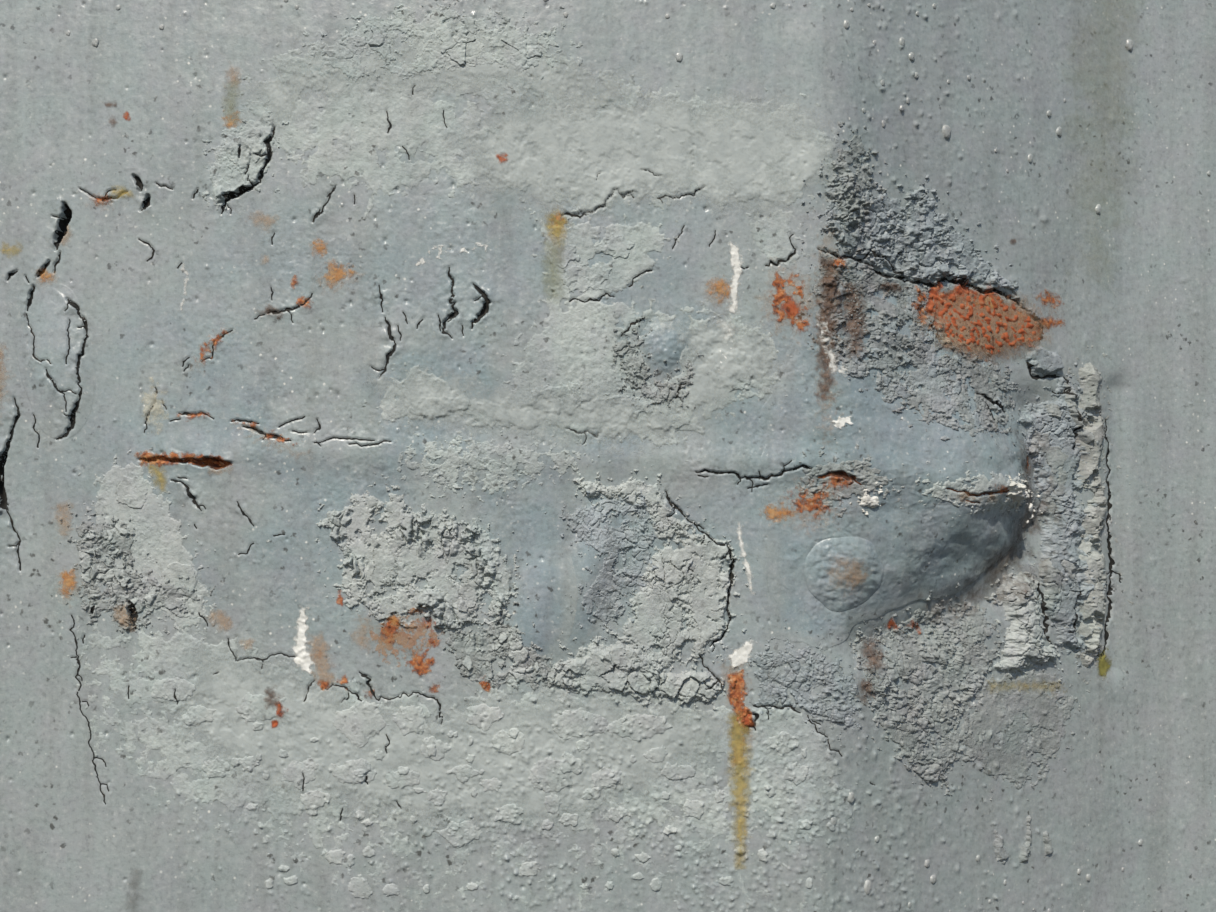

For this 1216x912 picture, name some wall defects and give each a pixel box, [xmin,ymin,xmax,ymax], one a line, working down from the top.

crack [561,169,704,249]
crack [0,126,275,571]
crack [371,267,490,378]
corrosion [769,259,865,399]
corrosion [912,282,1062,358]
corrosion [137,452,226,489]
spalling [139,457,231,470]
peeling [776,437,905,524]
crack [128,601,138,629]
crack [69,605,109,804]
corrosion [727,670,754,856]
peeling [452,877,491,905]